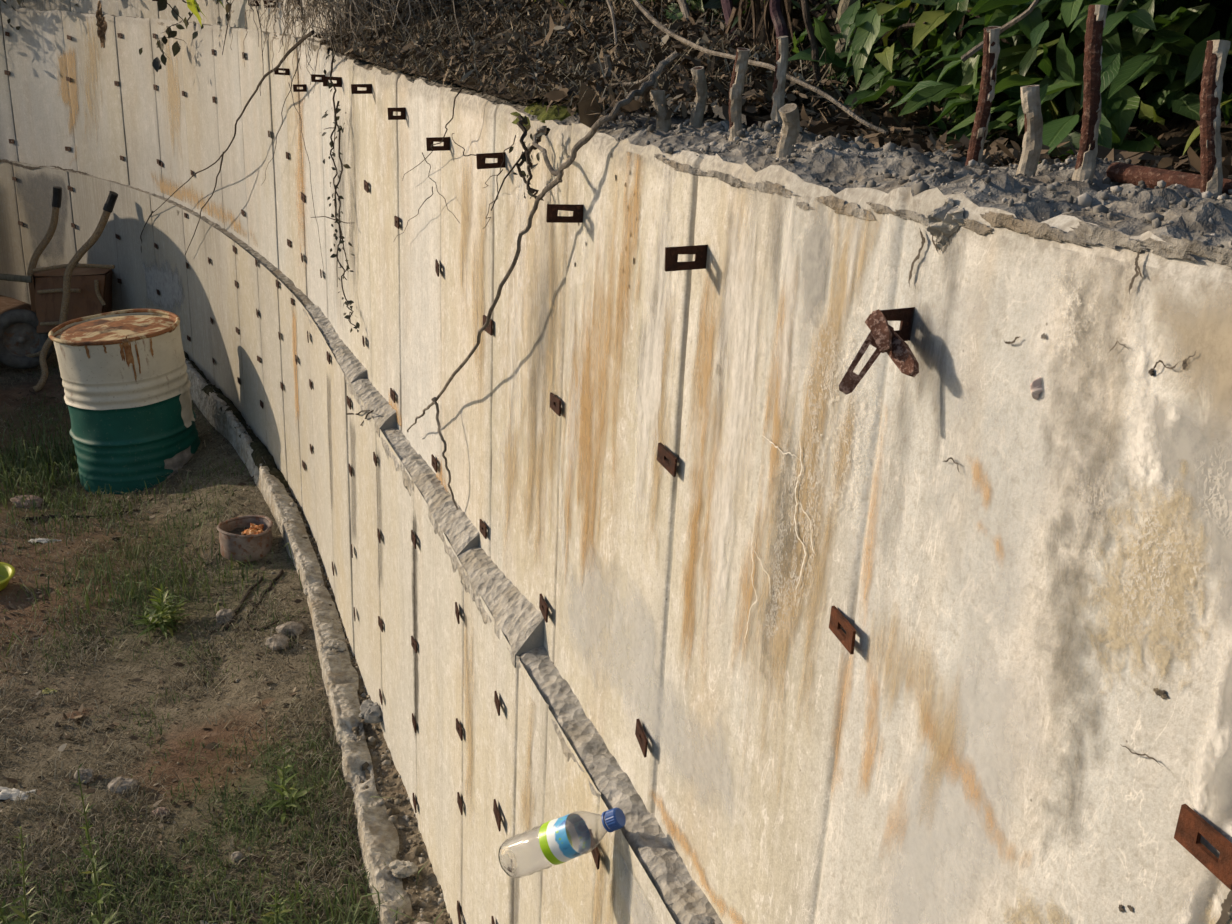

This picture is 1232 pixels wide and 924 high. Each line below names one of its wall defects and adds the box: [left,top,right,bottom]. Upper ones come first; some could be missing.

rust [58,22,99,134]
spalling [654,154,1232,268]
rust [506,155,639,565]
rust [652,321,670,515]
rust [739,233,866,693]
water stain [1055,353,1232,695]
water stain [1194,659,1232,843]
water stain [1181,897,1221,924]